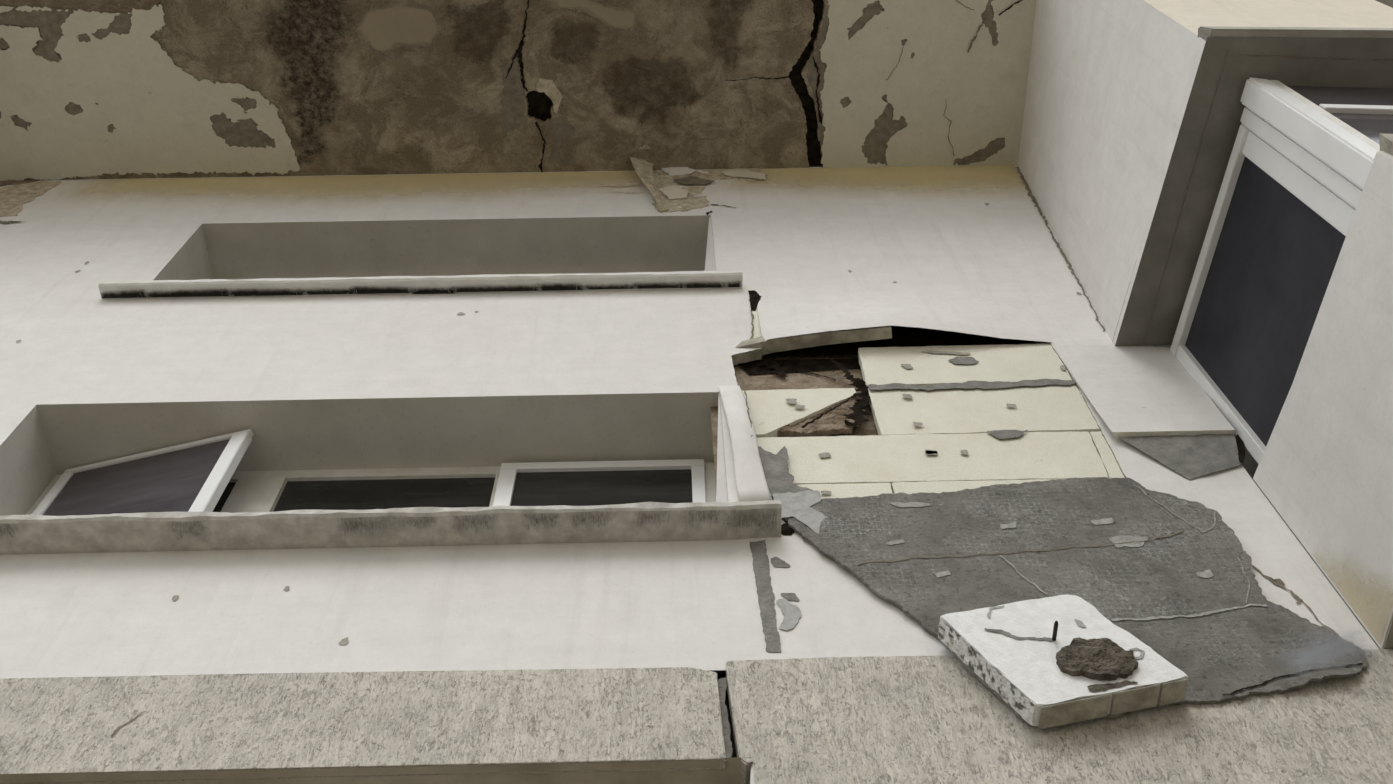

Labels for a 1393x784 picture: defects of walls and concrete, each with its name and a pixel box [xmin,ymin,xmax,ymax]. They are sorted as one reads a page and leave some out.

peeling [0,4,300,224]
leakage [101,0,638,194]
crack [499,0,575,172]
crack [725,0,828,168]
peeling [819,0,1036,168]
spalling [1112,430,1235,441]
peeling [771,557,790,568]
peeling [776,593,802,631]